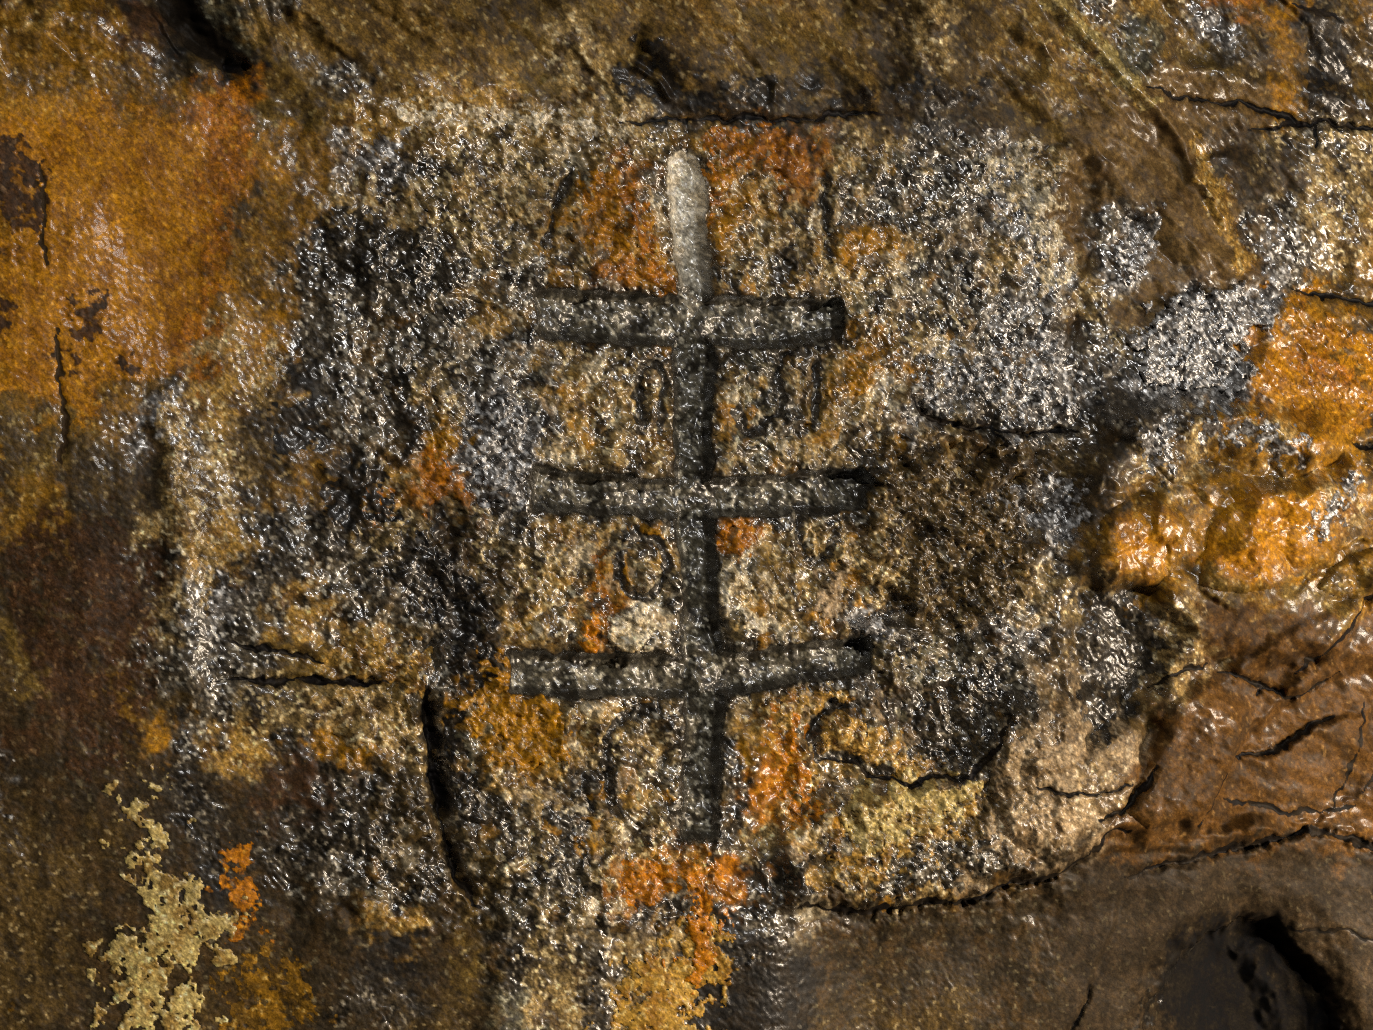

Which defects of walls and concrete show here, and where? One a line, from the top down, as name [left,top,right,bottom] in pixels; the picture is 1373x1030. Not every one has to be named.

crack [1147,86,1373,149]
crack [34,159,49,266]
crack [54,327,71,463]
crack [210,639,389,688]
crack [422,685,482,909]
crack [798,765,1159,915]
crack [1124,595,1373,880]